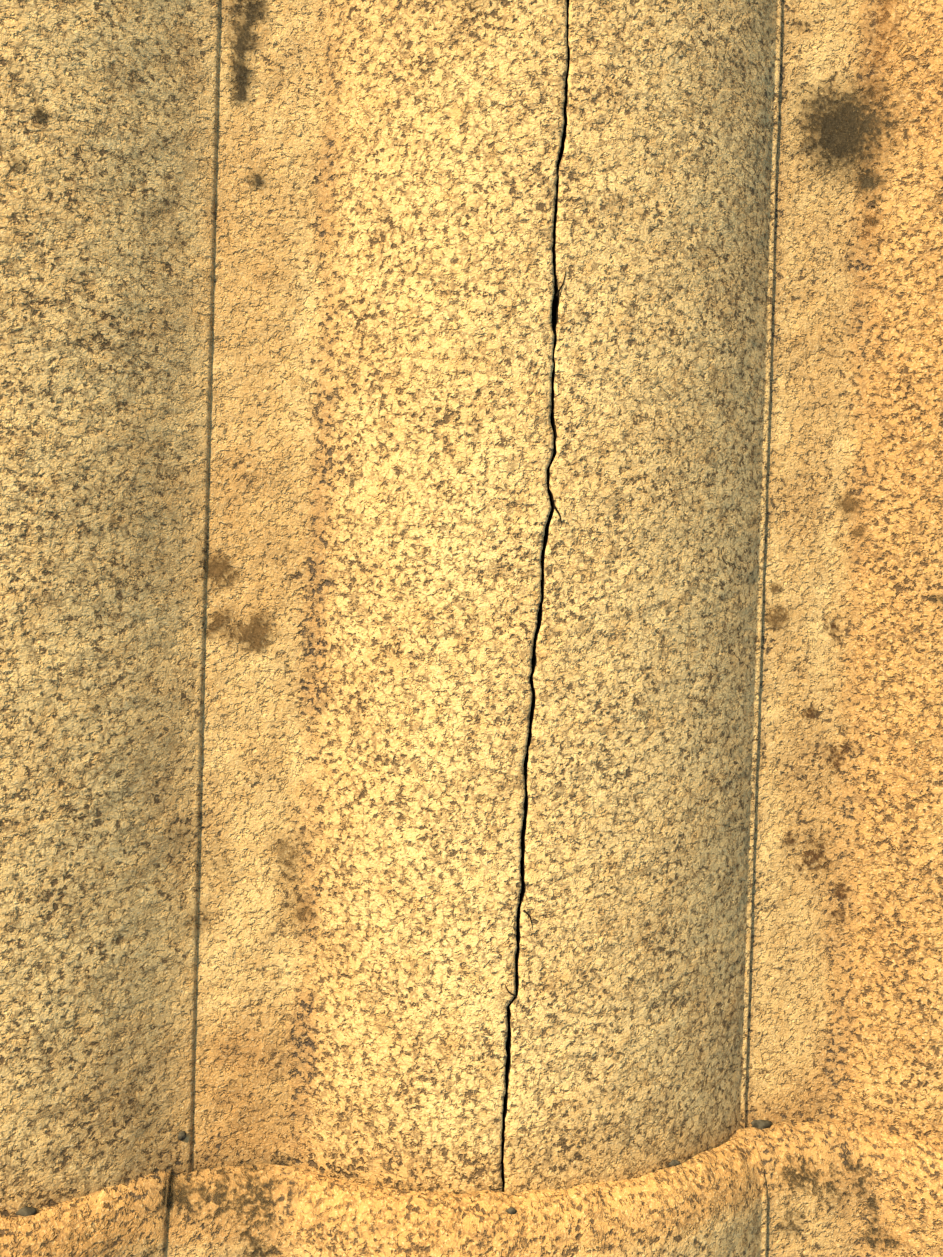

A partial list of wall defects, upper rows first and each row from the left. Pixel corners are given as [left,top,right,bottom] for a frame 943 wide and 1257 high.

damp [230,0,262,101]
damp [802,88,891,198]
crack [501,0,570,1192]